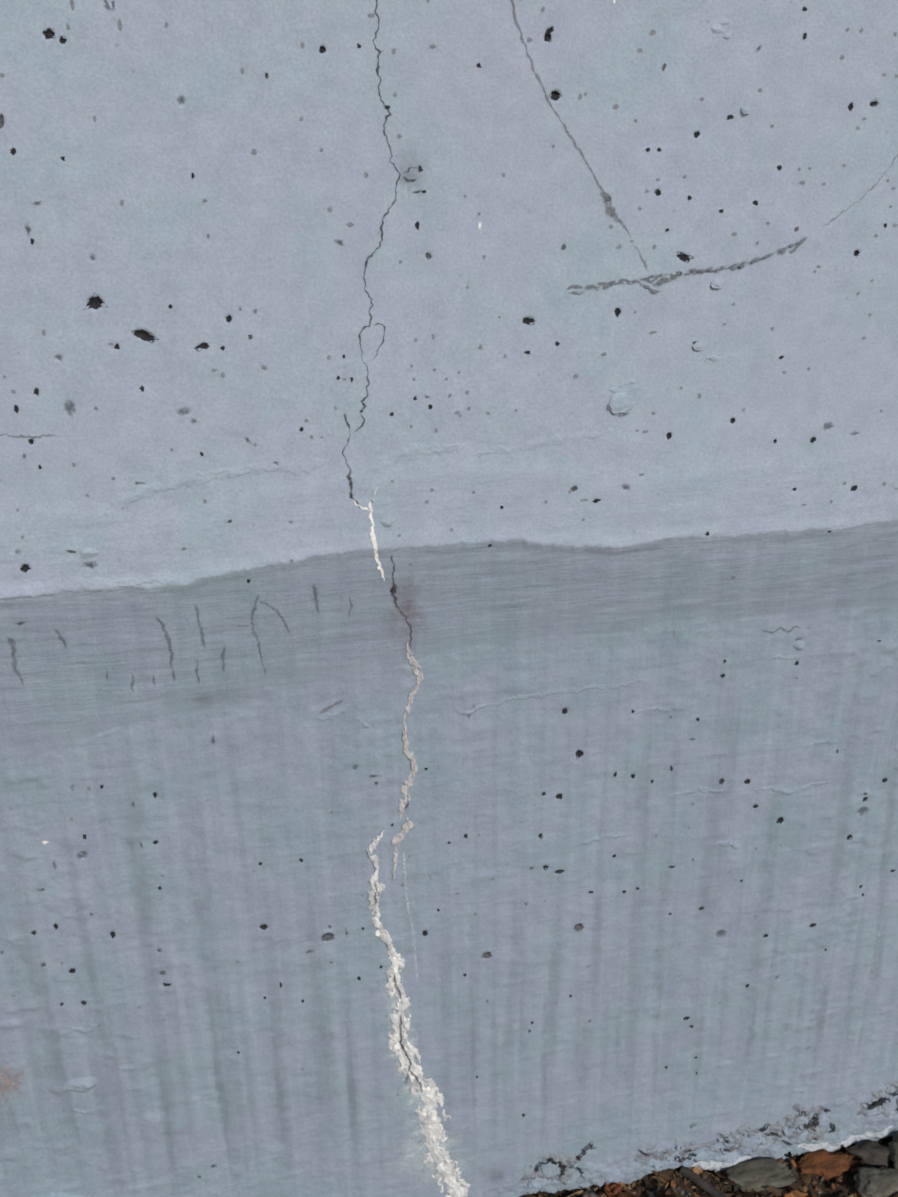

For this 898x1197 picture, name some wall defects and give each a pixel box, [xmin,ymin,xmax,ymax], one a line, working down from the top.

crack [342,0,471,1197]